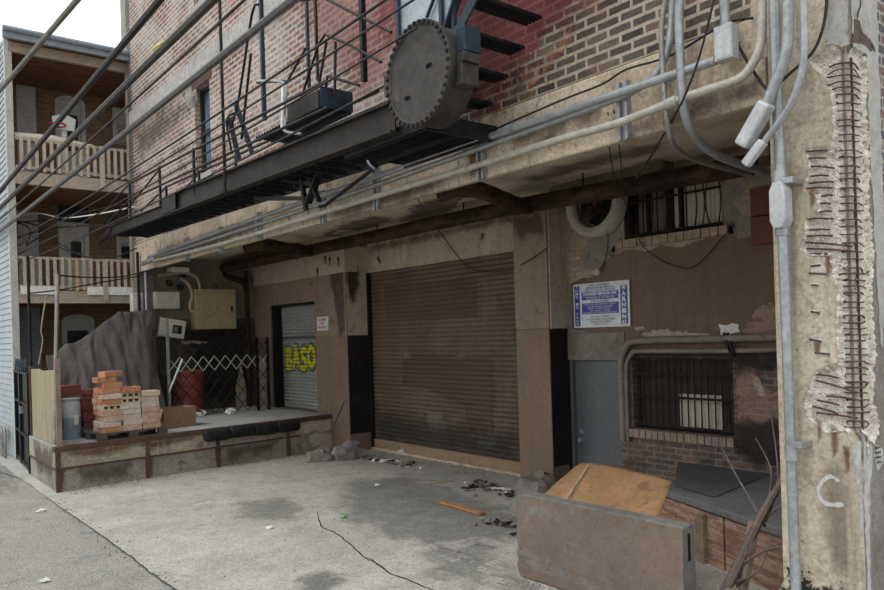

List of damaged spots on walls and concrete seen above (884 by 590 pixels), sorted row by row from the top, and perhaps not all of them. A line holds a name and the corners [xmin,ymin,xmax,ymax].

spalling [800,0,884,470]
peeling [741,302,776,334]
peeling [733,366,780,443]
rust [817,421,849,471]
crack [47,497,177,590]
crack [317,512,433,590]